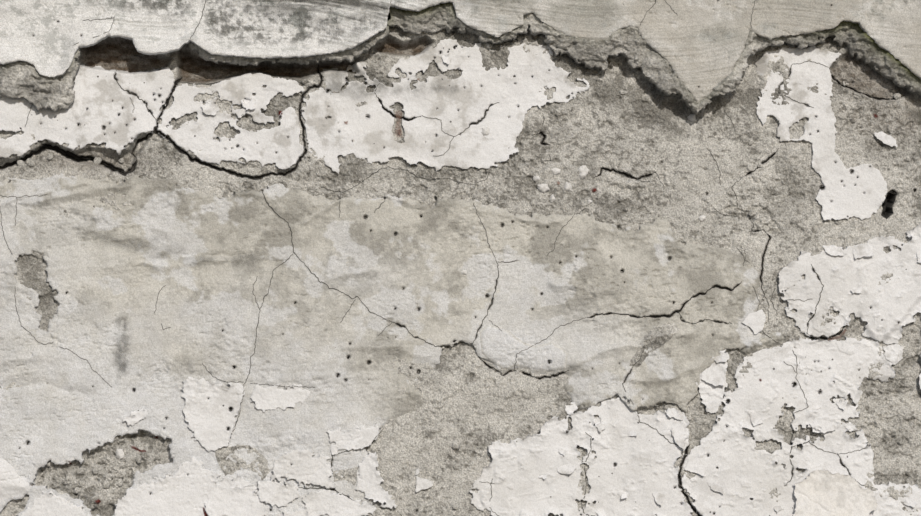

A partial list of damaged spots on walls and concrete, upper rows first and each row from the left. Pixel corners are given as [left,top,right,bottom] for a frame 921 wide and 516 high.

peeling [36,346,693,516]
crack [0,65,878,490]
spalling [0,3,921,340]
spalling [629,323,680,367]
crack [622,350,701,516]
peeling [681,224,921,516]